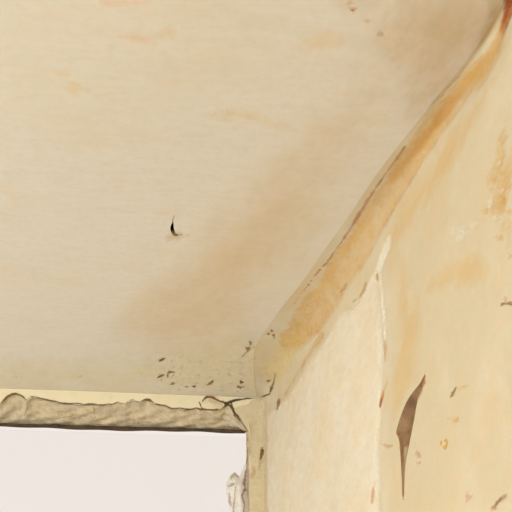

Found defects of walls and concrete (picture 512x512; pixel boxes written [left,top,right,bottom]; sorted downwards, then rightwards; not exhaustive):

spalling [0,393,248,431]
crack [224,393,270,417]
spalling [226,463,249,512]